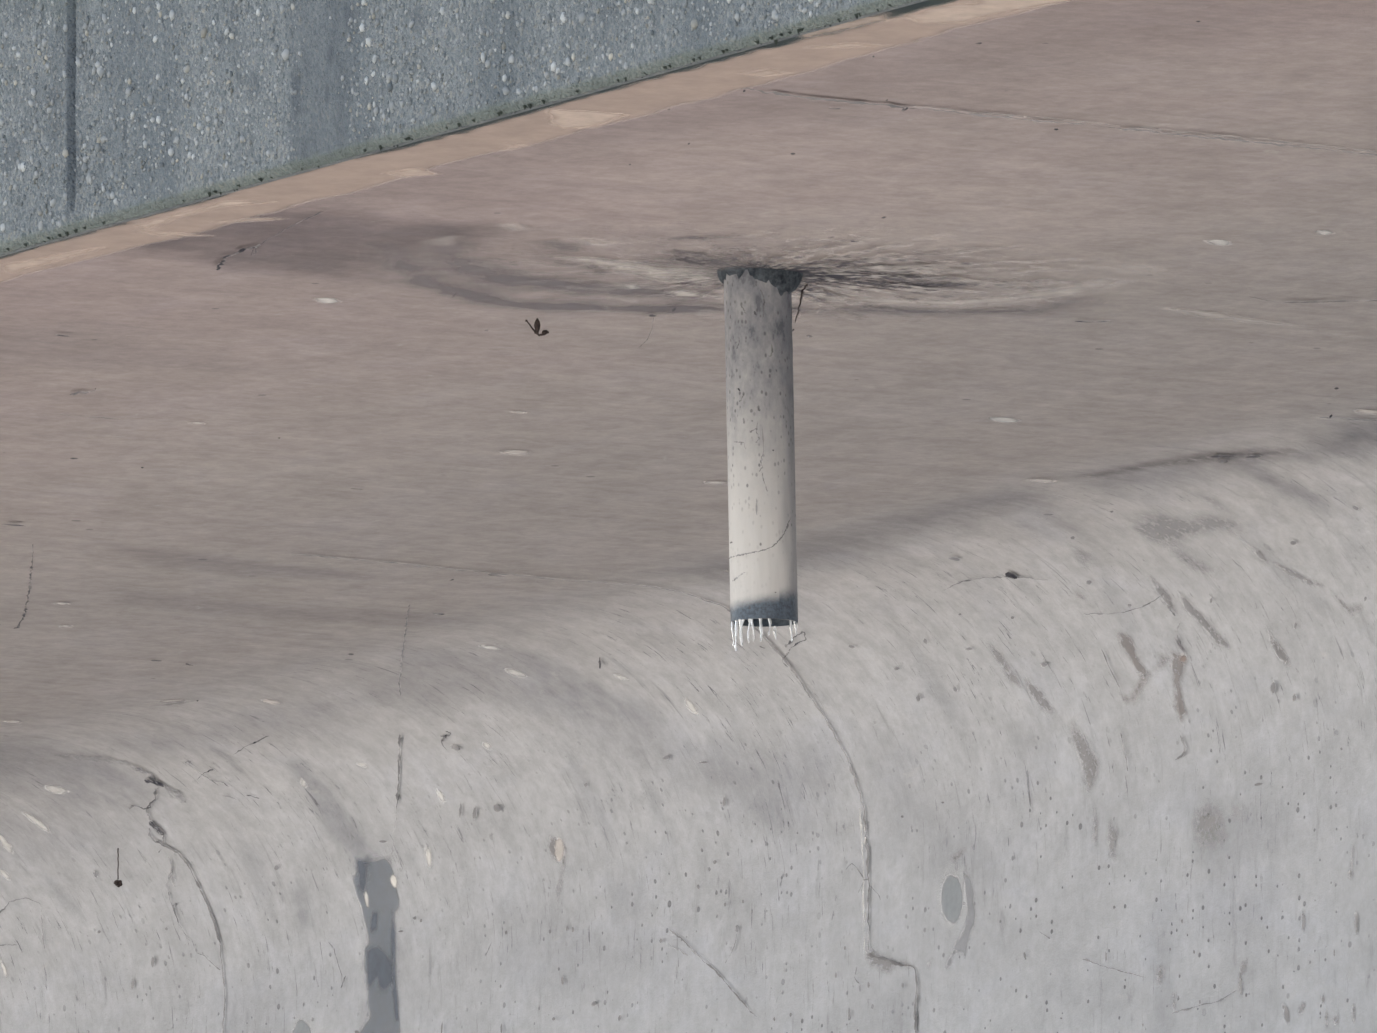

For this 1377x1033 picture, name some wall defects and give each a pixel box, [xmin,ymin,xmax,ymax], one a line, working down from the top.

water stain [391,246,1098,314]
water stain [353,859,400,1033]